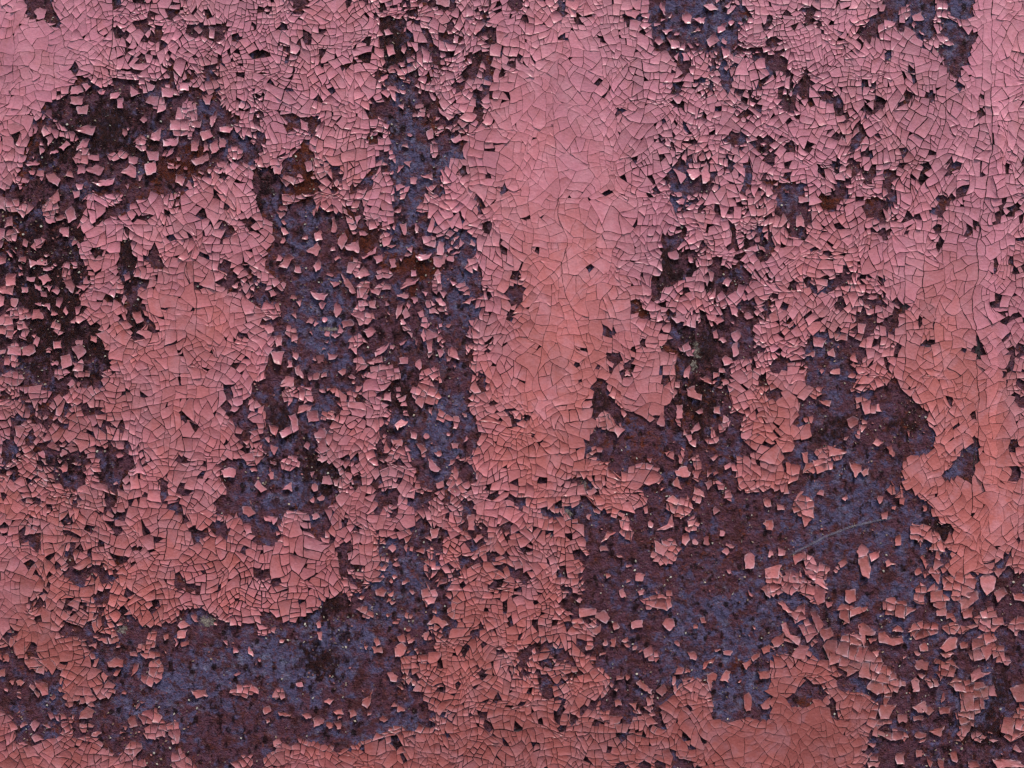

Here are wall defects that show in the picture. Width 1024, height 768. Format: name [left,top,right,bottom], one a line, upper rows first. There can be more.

crack [62,0,116,67]
corrosion [39,99,206,187]
corrosion [13,220,115,380]
crack [520,112,589,396]
crack [902,249,938,370]
crack [951,0,994,512]
crack [122,374,228,439]
peeling [0,0,534,768]
corrosion [682,382,718,438]
peeling [503,0,1024,768]
corrosion [295,453,355,514]
corrosion [921,504,955,552]